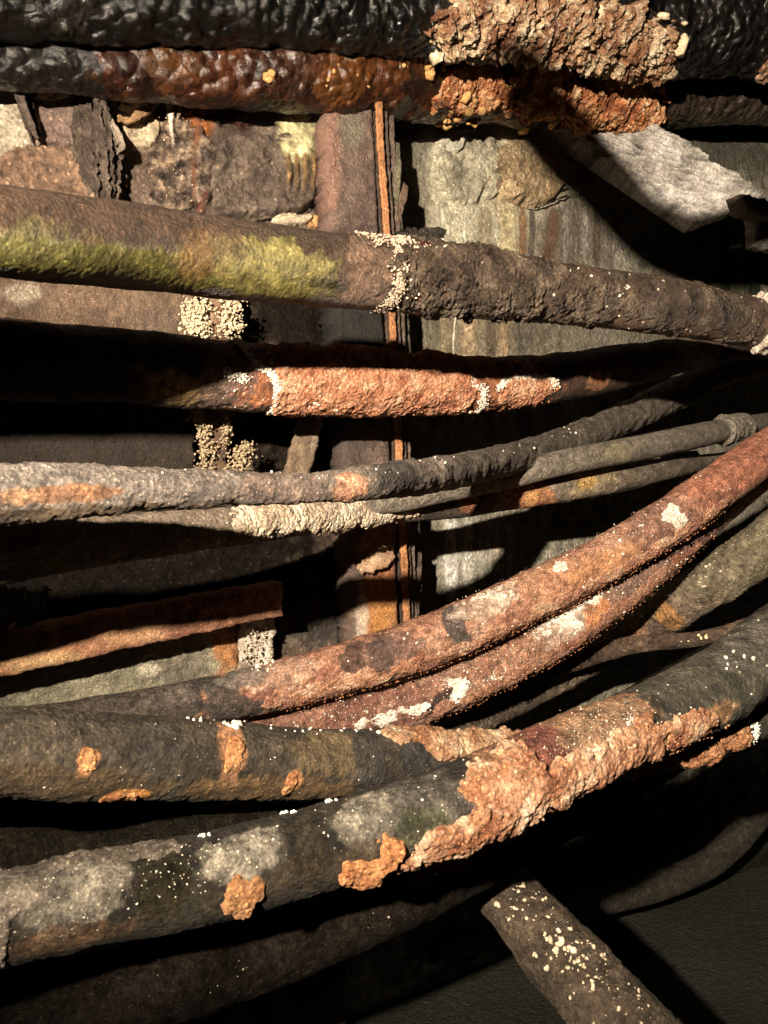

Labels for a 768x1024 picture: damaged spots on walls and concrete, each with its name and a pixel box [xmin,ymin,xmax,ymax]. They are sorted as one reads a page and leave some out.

rust [428,61,671,137]
efflorescence [354,230,419,314]
rust [266,102,767,461]
efflorescence [178,296,282,415]
efflorescence [229,501,420,540]
rust [255,495,754,891]
rust [77,746,96,771]
rust [224,736,245,773]
rust [98,793,138,804]